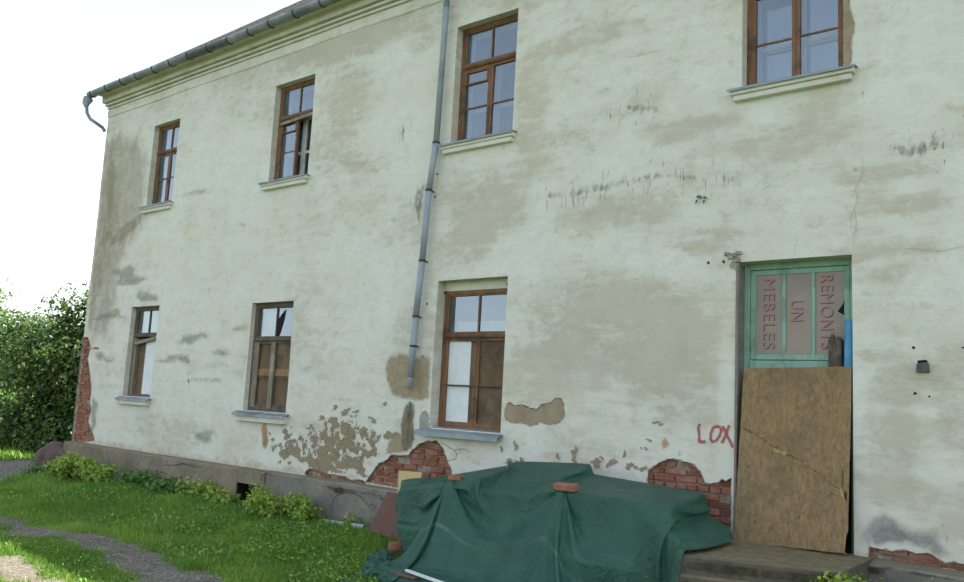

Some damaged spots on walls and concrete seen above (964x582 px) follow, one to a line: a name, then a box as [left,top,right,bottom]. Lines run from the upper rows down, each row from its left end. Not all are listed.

flaking render [843,0,855,66]
flaking render [71,337,99,442]
flaking render [262,405,452,488]
flaking render [504,398,565,426]
flaking render [590,450,731,529]
flaking render [868,546,964,580]